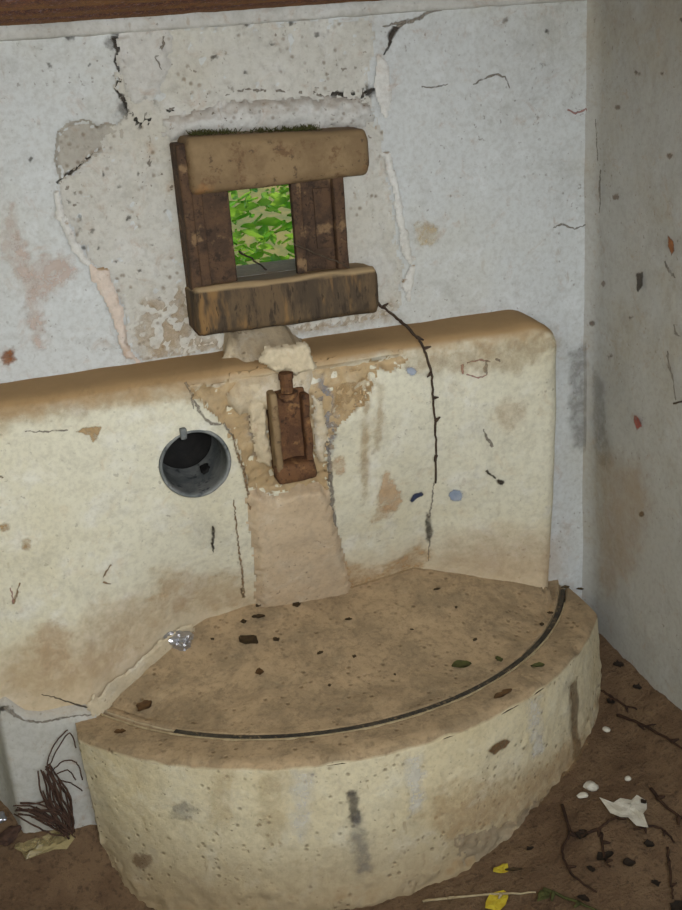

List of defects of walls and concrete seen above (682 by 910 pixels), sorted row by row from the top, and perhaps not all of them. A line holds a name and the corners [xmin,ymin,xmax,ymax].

crack [382,10,441,55]
crack [112,36,175,127]
crack [225,86,375,100]
flaking render [53,18,416,493]
crack [0,694,91,723]